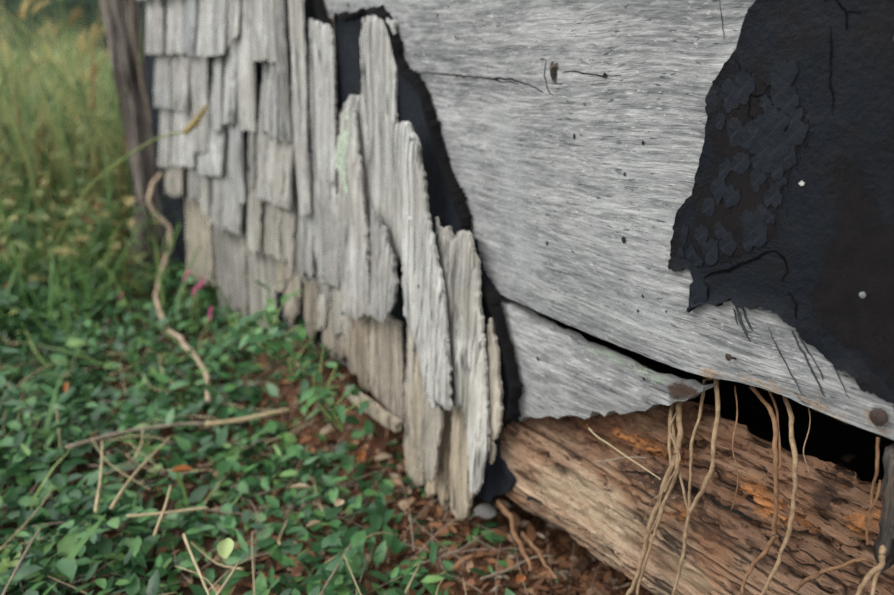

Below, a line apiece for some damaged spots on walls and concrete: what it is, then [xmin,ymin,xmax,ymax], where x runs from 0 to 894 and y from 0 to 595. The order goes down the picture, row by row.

crack [420,62,621,95]
crack [824,0,862,112]
spalling [733,306,753,341]
spalling [791,331,825,397]